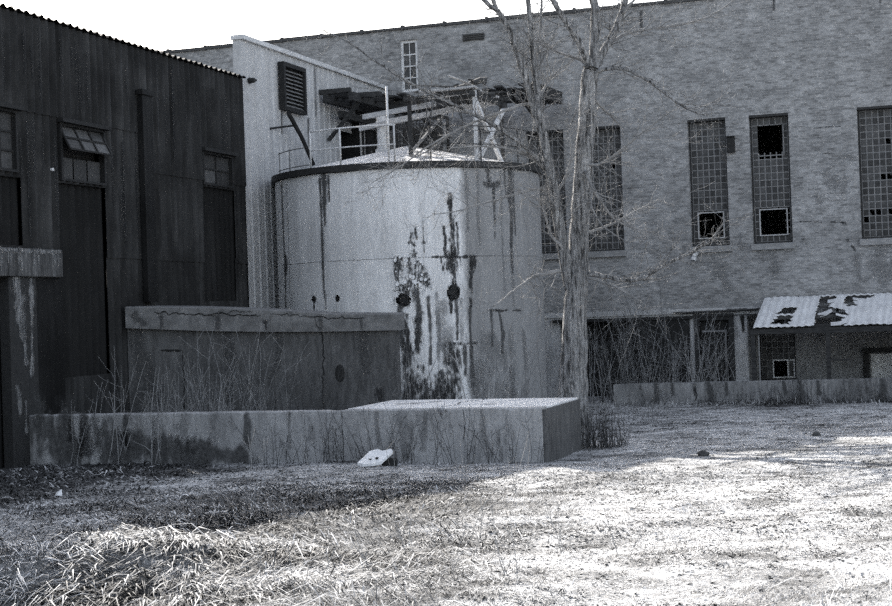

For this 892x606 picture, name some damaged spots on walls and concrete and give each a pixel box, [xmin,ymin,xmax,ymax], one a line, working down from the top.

crack [155,310,363,410]
rust [401,192,476,400]